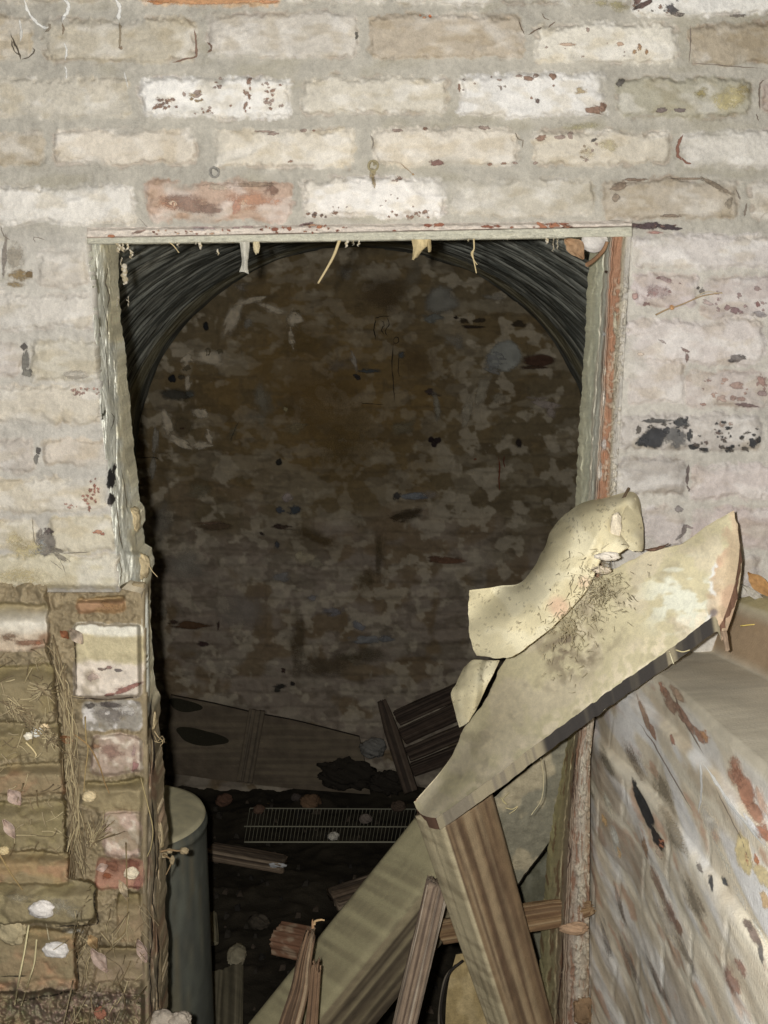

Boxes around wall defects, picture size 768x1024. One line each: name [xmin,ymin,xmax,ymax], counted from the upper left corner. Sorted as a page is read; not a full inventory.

peeling [635,417,761,453]
spalling [632,778,682,935]